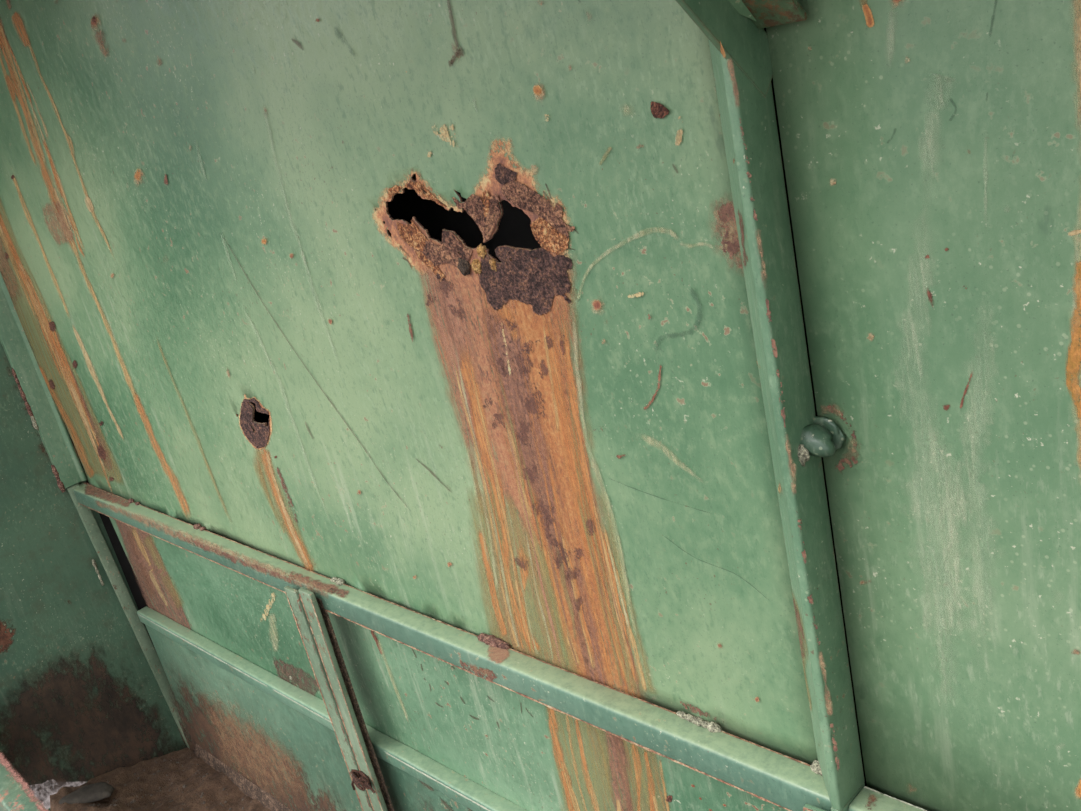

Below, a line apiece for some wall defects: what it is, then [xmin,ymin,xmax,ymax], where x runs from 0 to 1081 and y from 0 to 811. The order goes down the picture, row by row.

corrosion [0,0,189,512]
corrosion [0,203,349,630]
corrosion [373,138,651,696]
corrosion [1066,262,1081,427]
corrosion [0,647,177,811]
corrosion [371,630,407,718]
corrosion [549,708,672,811]